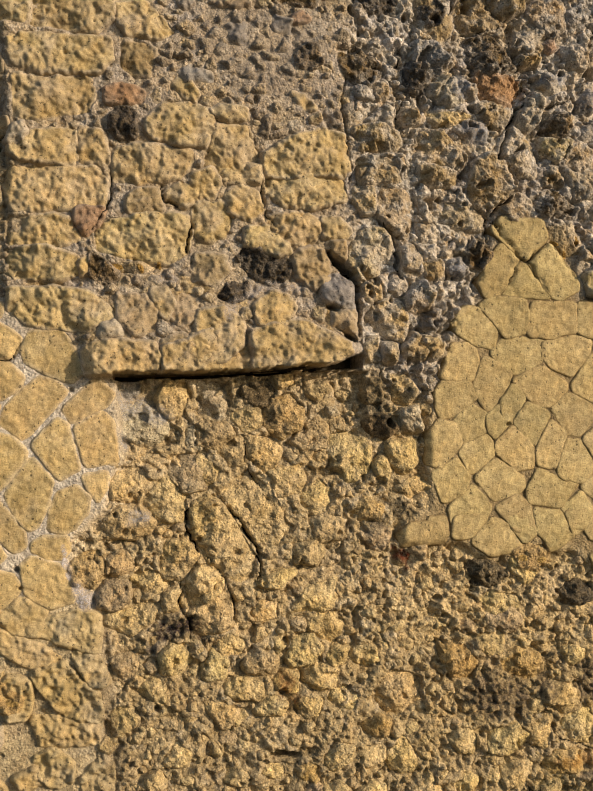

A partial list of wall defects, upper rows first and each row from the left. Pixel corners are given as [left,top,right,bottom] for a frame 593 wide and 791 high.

crack [498,90,531,160]
crack [115,359,350,381]
crack [184,505,235,617]
crack [230,509,261,580]